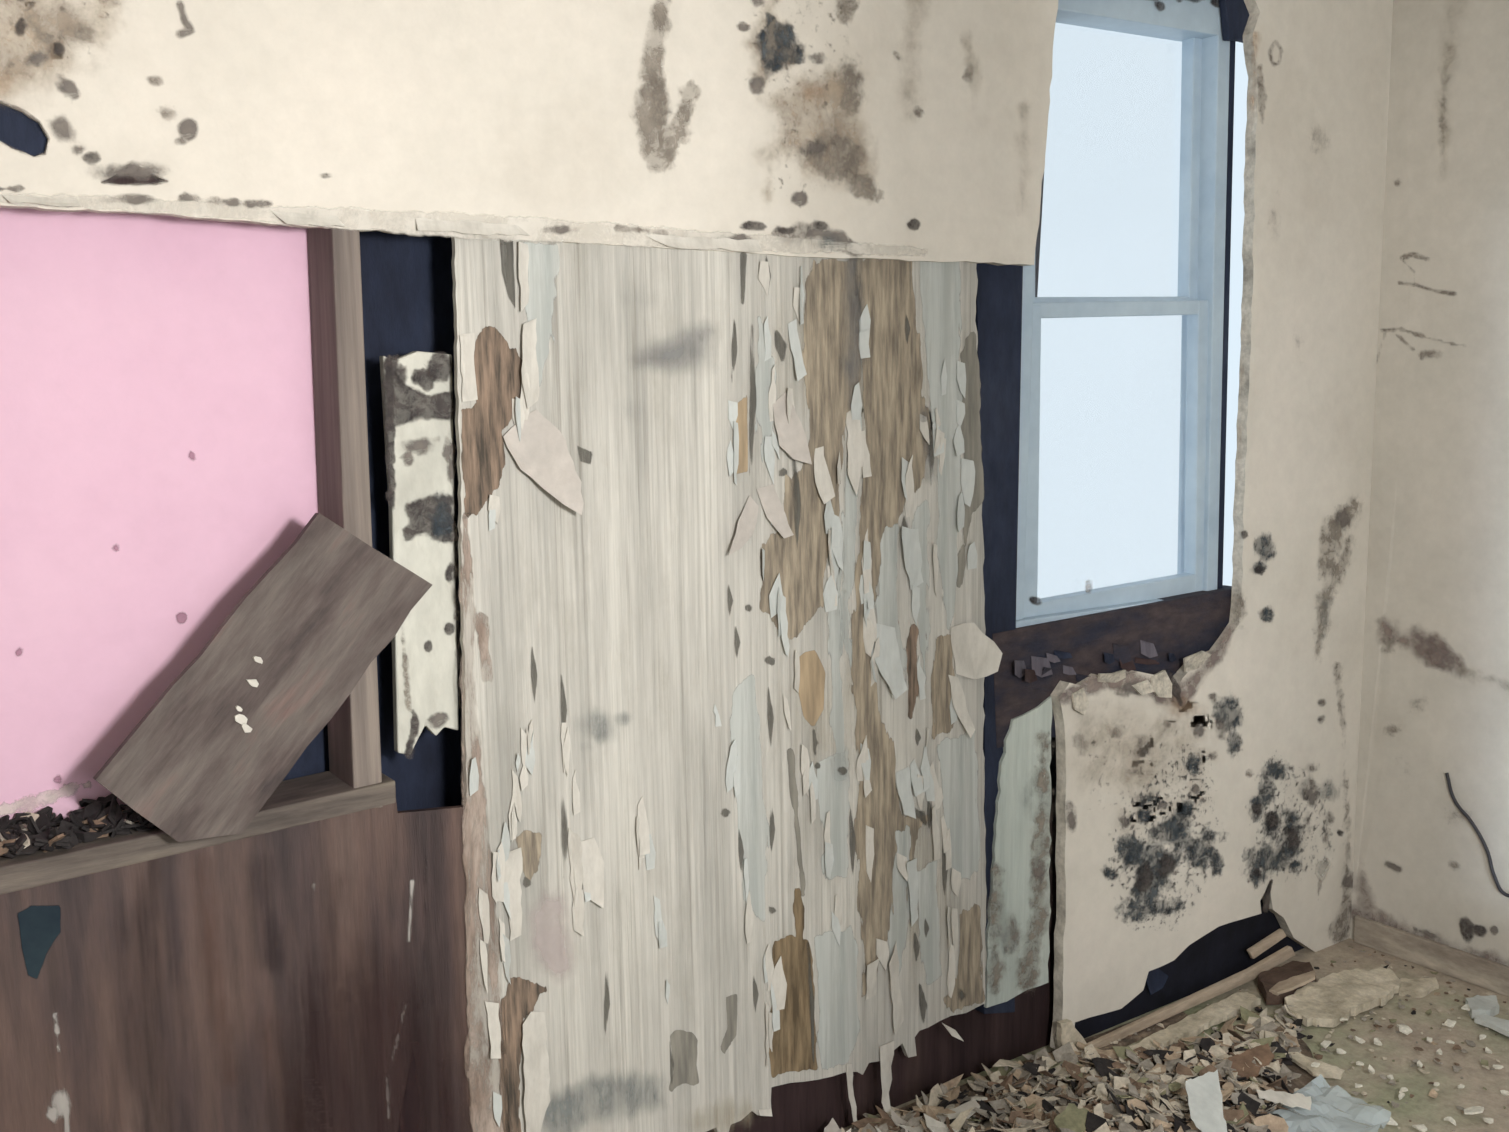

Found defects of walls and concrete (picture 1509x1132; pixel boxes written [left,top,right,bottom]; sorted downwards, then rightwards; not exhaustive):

damp [0,0,91,98]
damp [52,118,99,162]
damp [162,111,197,144]
damp [177,2,193,37]
damp [635,1,698,168]
damp [739,0,831,93]
damp [792,192,807,206]
damp [1317,500,1358,653]
peeling [0,163,1003,1132]
flaking render [1060,627,1232,715]
damp [1103,698,1242,929]
damp [1246,759,1348,887]